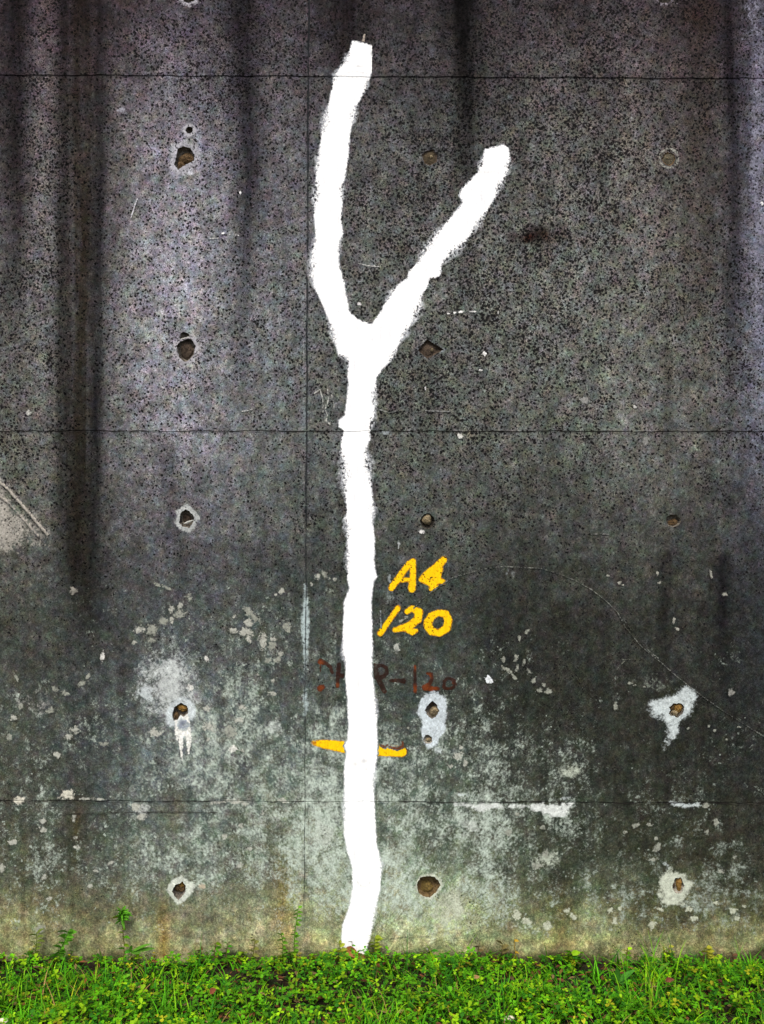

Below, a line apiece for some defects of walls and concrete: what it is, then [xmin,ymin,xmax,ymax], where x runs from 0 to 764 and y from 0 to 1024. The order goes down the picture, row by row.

leakage [0,0,316,927]
leakage [375,560,402,639]
crack [413,566,764,737]
leakage [627,548,739,753]
leakage [218,760,349,896]
leakage [379,740,405,751]
leakage [413,689,450,758]
leakage [377,759,593,956]
leakage [653,851,700,912]
leakage [666,798,702,811]